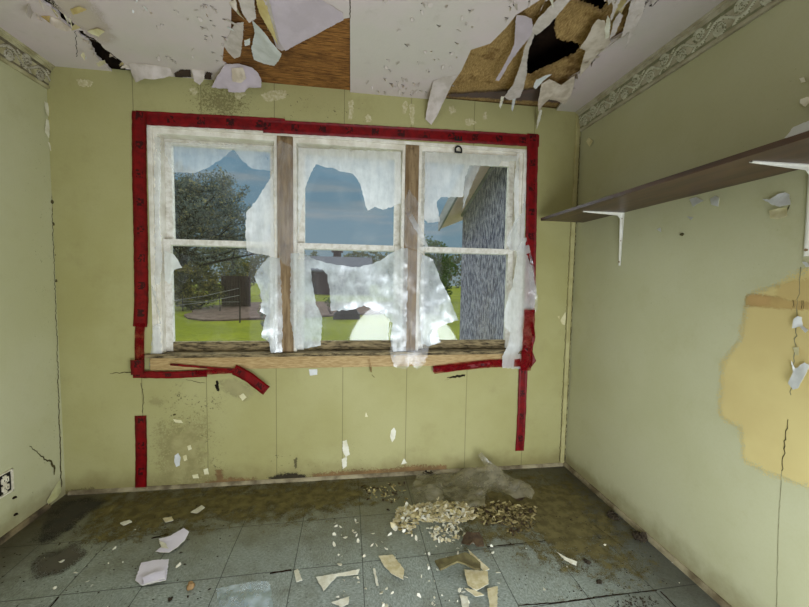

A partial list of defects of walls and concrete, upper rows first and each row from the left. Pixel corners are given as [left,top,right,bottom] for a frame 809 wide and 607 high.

spalling [581,0,607,9]
crack [26,0,130,70]
spalling [523,19,581,74]
peeling [128,55,213,96]
crack [799,77,809,107]
peeling [785,121,809,138]
peeling [763,192,791,219]
crack [788,262,809,395]
crack [778,420,788,534]